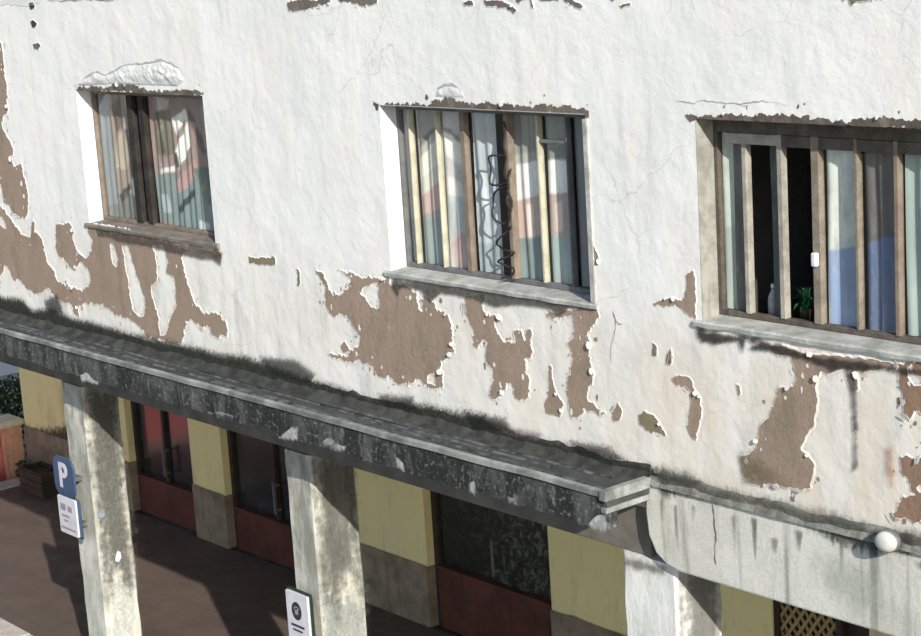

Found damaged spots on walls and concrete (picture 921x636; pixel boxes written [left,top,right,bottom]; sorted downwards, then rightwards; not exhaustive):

flaking render [287,0,378,13]
spalling [463,0,535,15]
spalling [563,0,584,11]
flaking render [0,41,229,345]
flaking render [653,270,698,319]
flaking render [315,265,535,405]
flaking render [544,302,623,430]
damp [281,427,297,440]
flaking render [738,342,921,502]
flaking render [889,447,921,526]
crack [710,504,718,564]